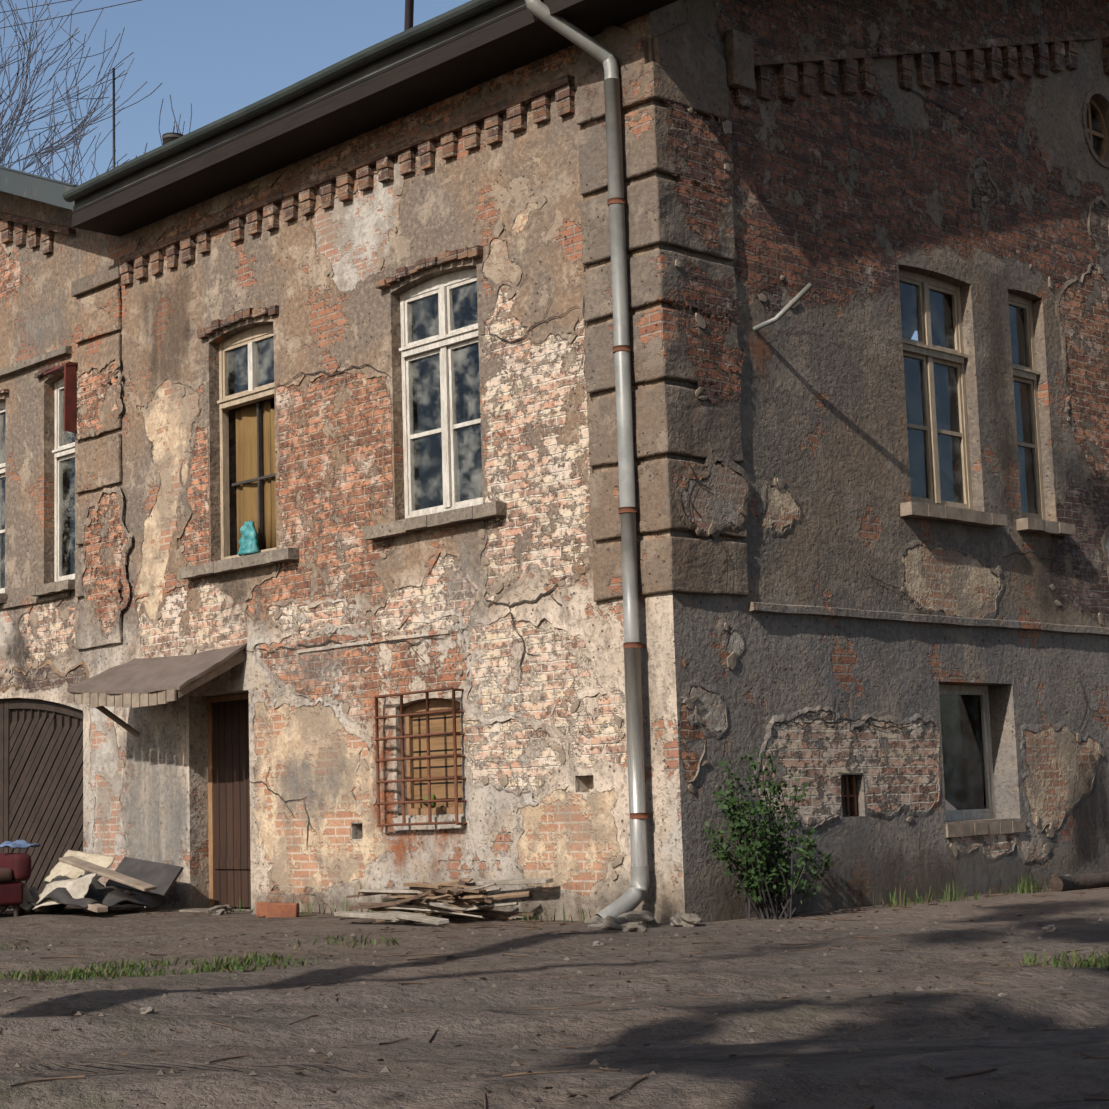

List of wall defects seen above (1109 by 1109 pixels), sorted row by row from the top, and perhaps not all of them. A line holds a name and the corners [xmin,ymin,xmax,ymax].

flaking render [665,52,1109,629]
flaking render [0,195,628,904]
crack [486,574,569,685]
flaking render [715,620,746,670]
flaking render [680,677,729,797]
flaking render [752,706,943,833]
flaking render [949,719,1105,865]